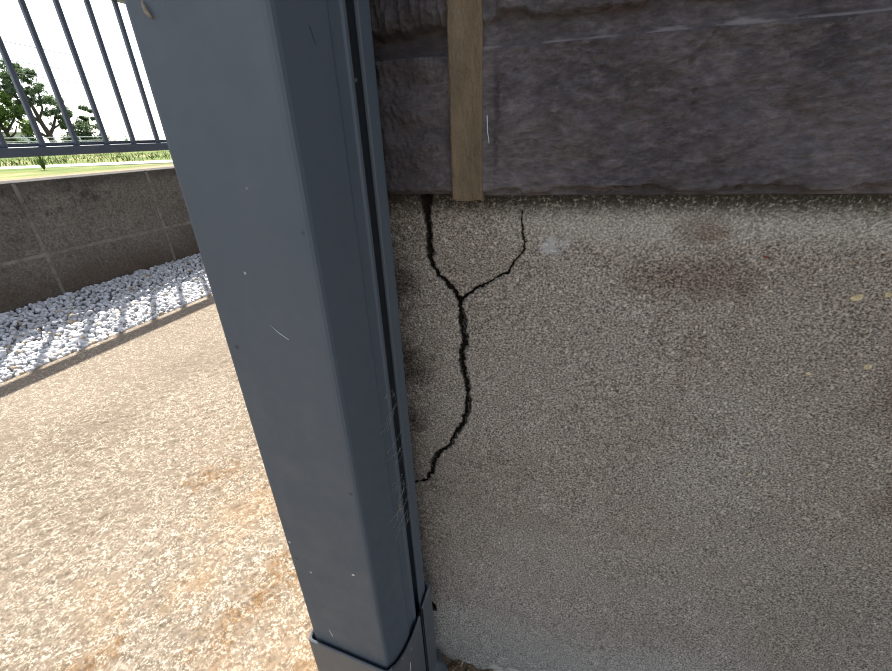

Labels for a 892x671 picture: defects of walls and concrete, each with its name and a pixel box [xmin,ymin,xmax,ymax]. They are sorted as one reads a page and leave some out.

crack [415,194,527,482]